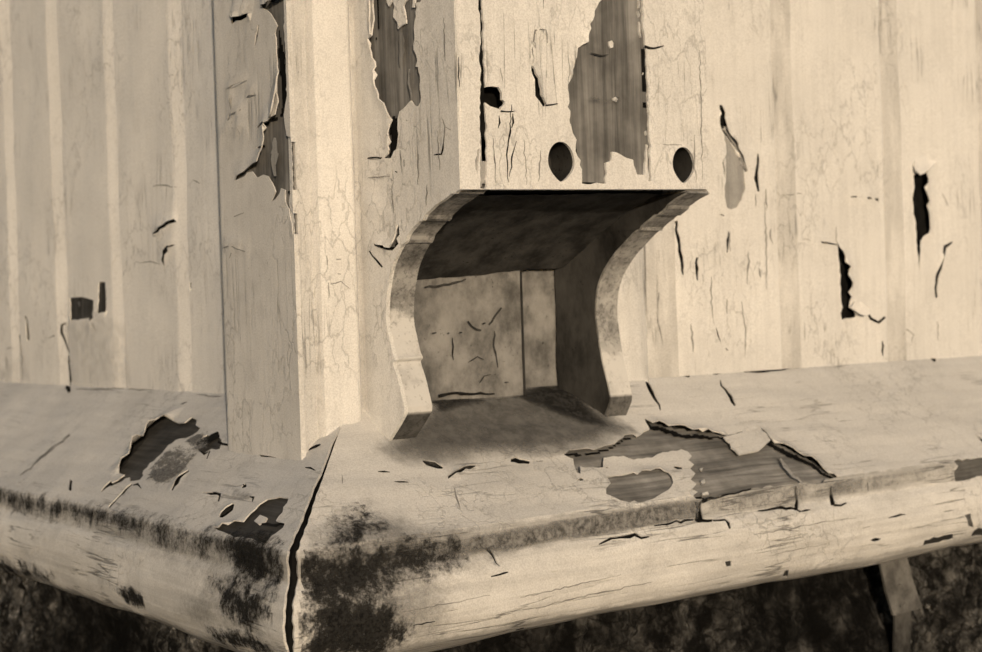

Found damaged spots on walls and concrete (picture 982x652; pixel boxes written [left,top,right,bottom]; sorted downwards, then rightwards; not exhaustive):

peeling [236,0,296,234]
peeling [368,0,421,158]
peeling [568,0,650,183]
peeling [821,226,885,324]
peeling [912,157,937,256]
leakage [0,490,284,652]
peeling [104,418,222,507]
crack [203,432,228,446]
peeling [215,495,288,541]
crack [285,437,343,652]
leakage [299,501,699,652]
peeling [564,420,836,502]